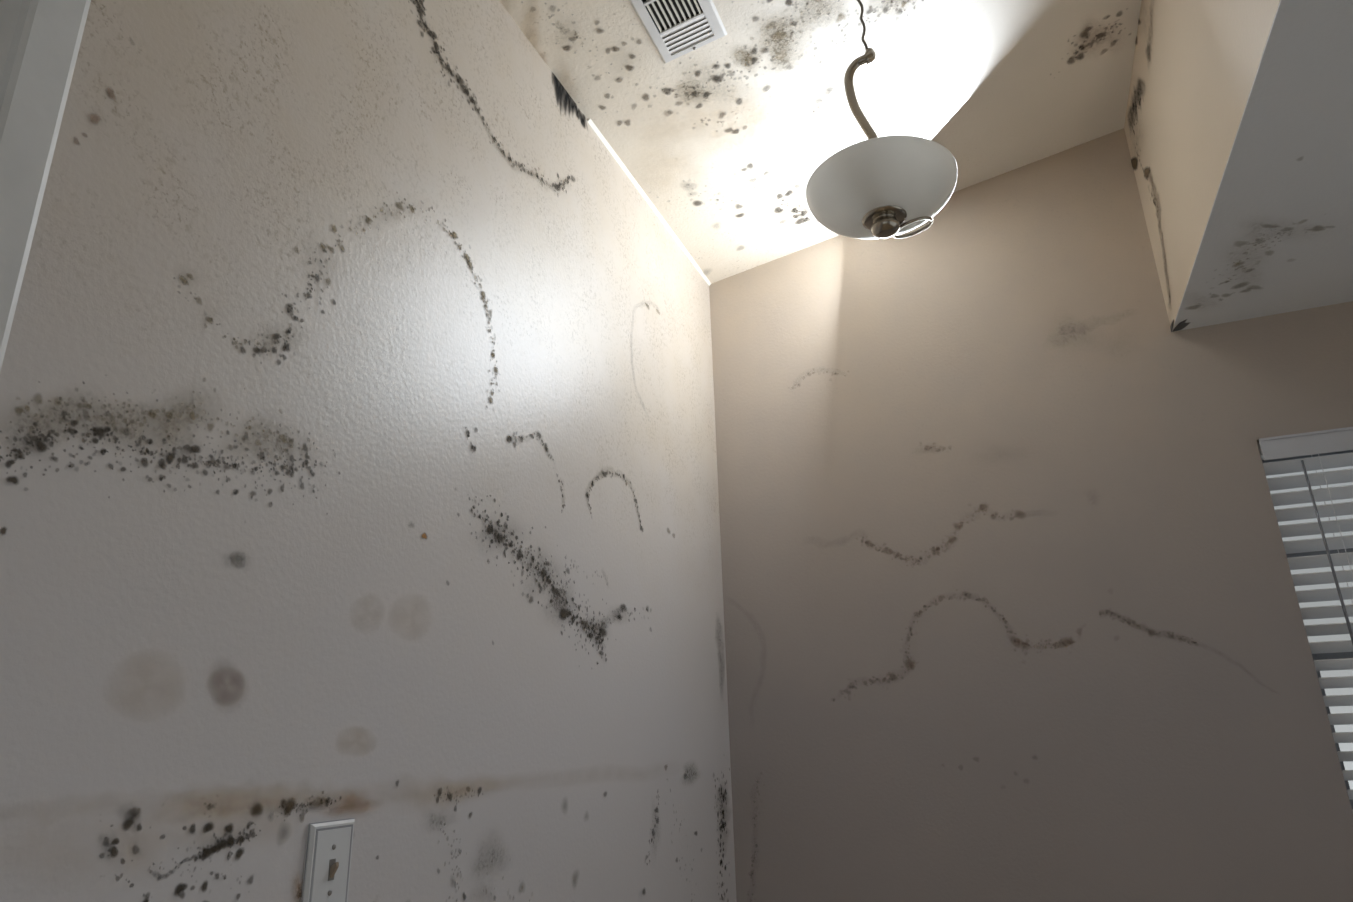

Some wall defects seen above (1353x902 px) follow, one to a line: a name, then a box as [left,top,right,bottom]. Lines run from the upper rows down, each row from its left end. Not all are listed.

leakage [413,0,569,190]
crack [553,73,586,127]
leakage [687,30,785,108]
leakage [776,191,810,224]
leakage [307,225,344,298]
leakage [232,304,303,364]
leakage [438,219,498,403]
mould [0,412,315,496]
mould [469,495,607,661]
leakage [111,809,141,881]
leakage [181,823,257,864]
leakage [176,874,219,898]